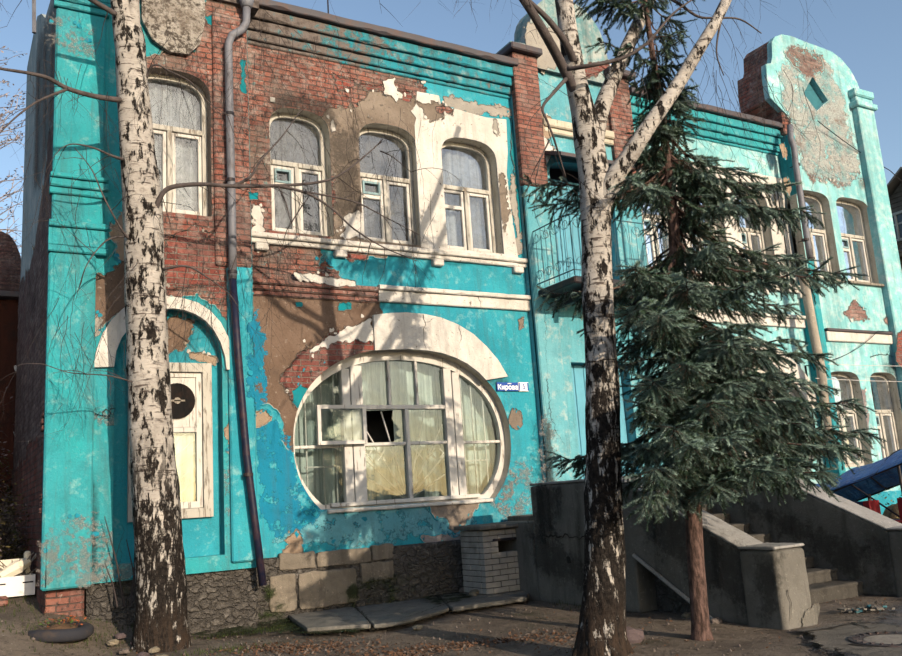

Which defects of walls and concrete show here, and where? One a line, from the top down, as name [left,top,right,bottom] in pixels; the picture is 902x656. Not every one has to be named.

flaking render [146,0,243,320]
peeling [778,44,862,190]
flaking render [95,211,125,337]
flaking render [167,314,219,366]
flaking render [239,31,523,554]
flaking render [843,299,870,322]